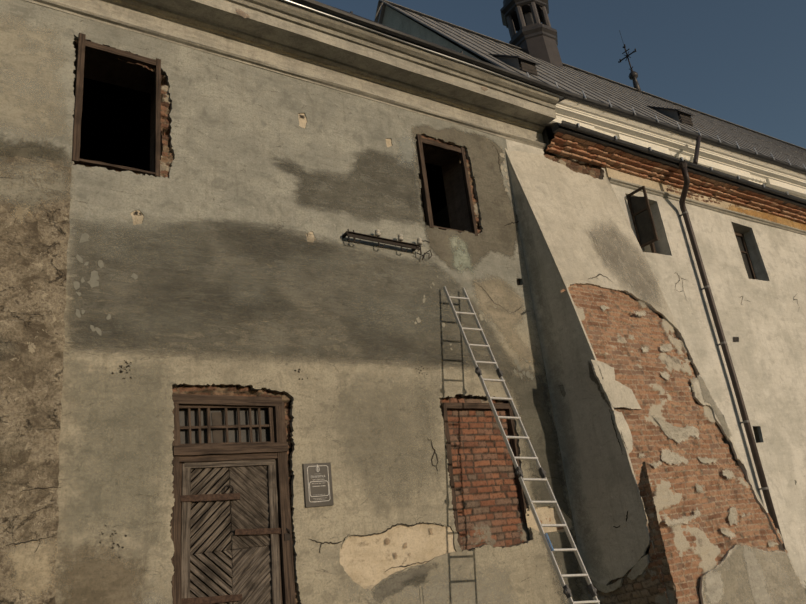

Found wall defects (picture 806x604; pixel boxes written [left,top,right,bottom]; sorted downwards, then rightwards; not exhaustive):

water stain [0,140,64,161]
water stain [278,137,422,222]
flaking render [543,149,601,179]
water stain [70,222,572,518]
spalling [172,385,292,511]
flaking render [561,284,788,604]
peeling [8,541,57,604]
flaking render [340,522,456,590]
water stain [545,529,583,604]